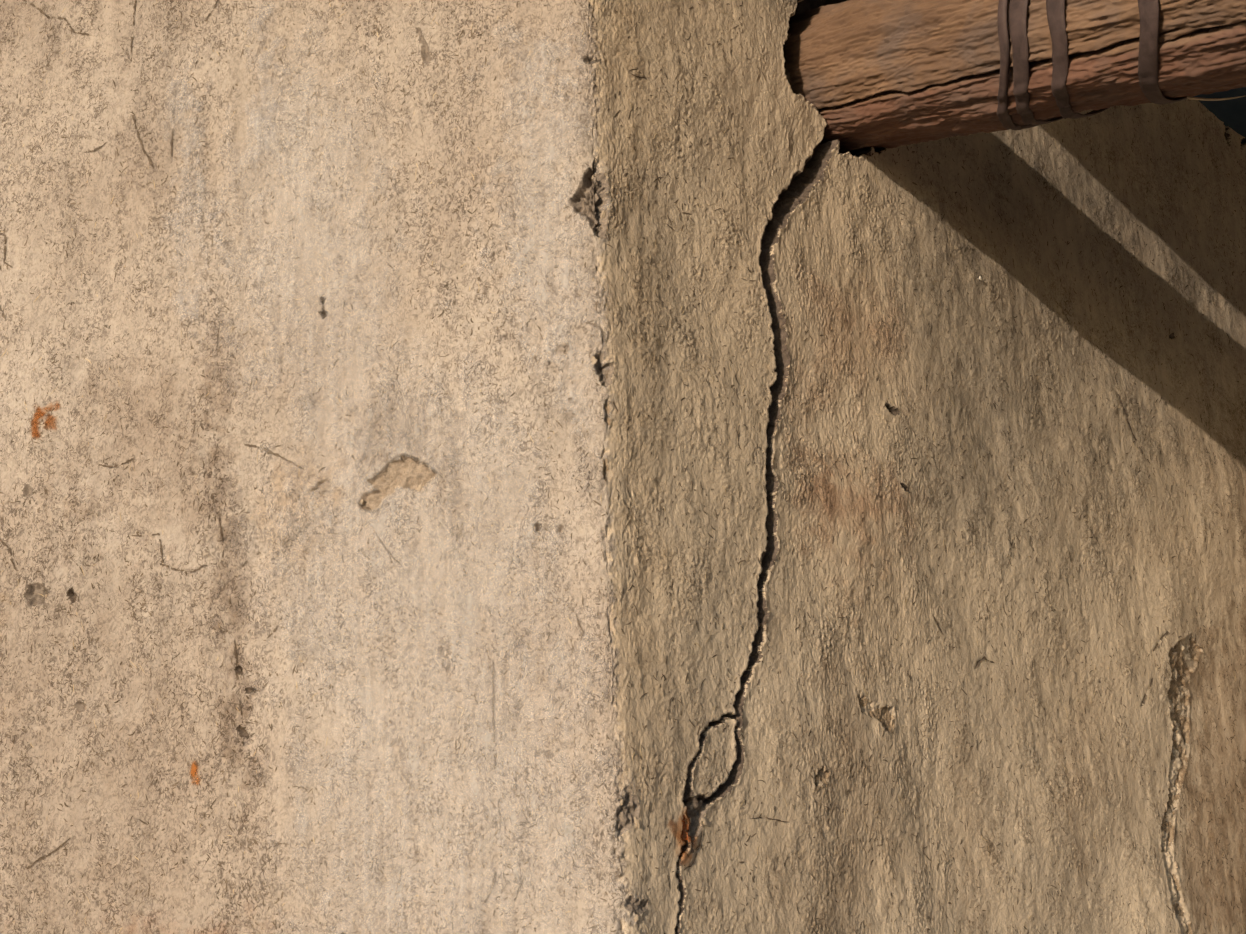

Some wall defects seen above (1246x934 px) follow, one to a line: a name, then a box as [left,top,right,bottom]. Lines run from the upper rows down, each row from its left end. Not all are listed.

spalling [568,162,611,239]
spalling [357,454,438,512]
crack [675,124,839,934]
peeling [1161,638,1204,934]